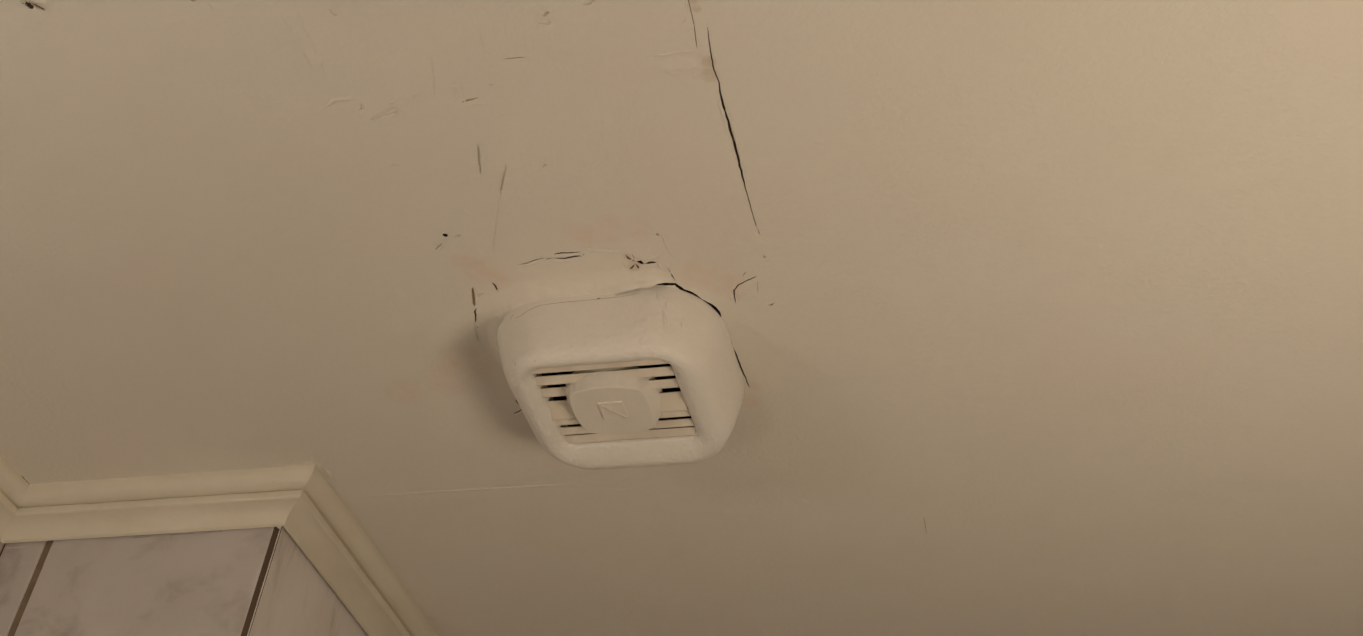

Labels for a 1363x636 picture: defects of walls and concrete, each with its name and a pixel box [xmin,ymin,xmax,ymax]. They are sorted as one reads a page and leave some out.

crack [684,0,761,236]
crack [471,254,759,386]